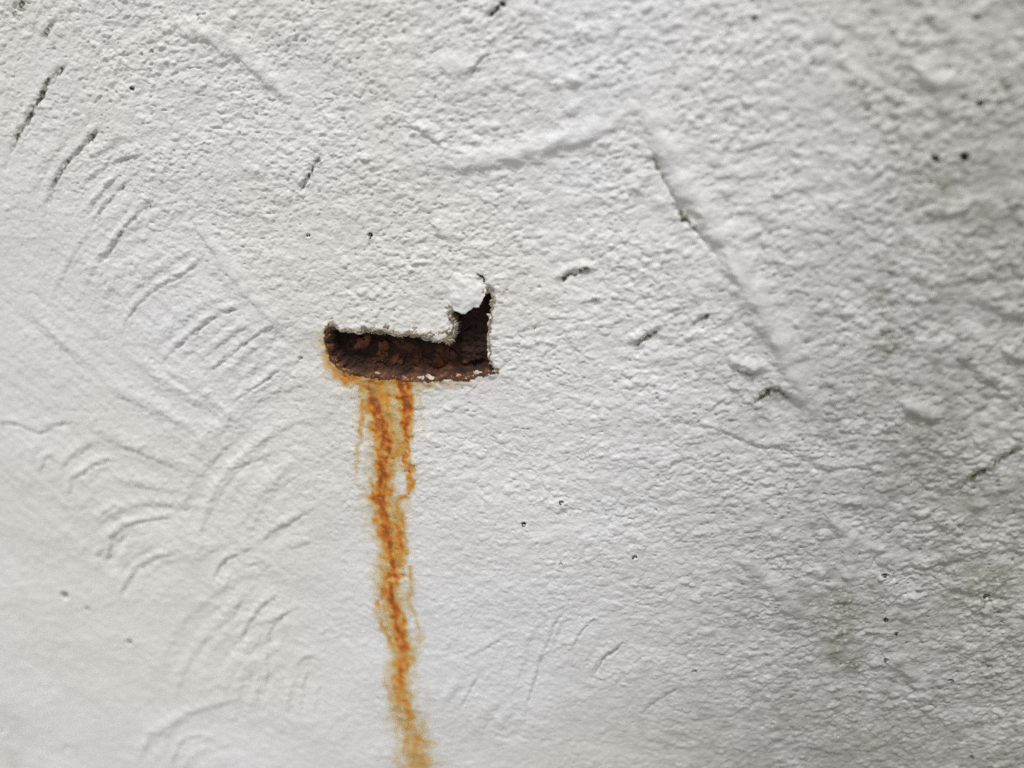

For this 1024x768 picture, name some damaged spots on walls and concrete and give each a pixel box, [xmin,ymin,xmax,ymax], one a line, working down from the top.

spalling [323,272,499,383]
corrosion [323,342,434,768]